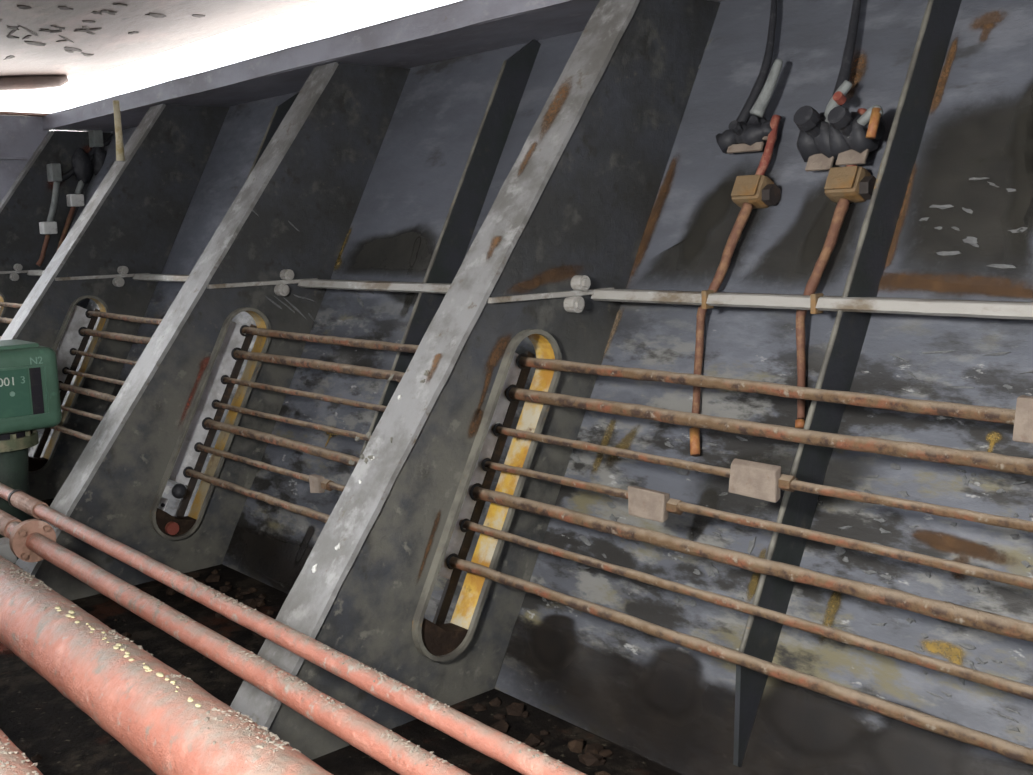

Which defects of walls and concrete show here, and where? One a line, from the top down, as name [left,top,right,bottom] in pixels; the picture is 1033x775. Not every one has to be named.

peeling [0,3,128,56]
rust [972,11,1003,41]
rust [931,40,957,110]
rust [518,82,569,175]
rust [630,159,676,275]
peeling [919,204,979,256]
rust [878,166,1033,298]
rust [427,354,441,381]
rust [468,335,510,438]
rust [913,530,1005,578]
damp [643,647,701,715]
damp [764,679,975,775]